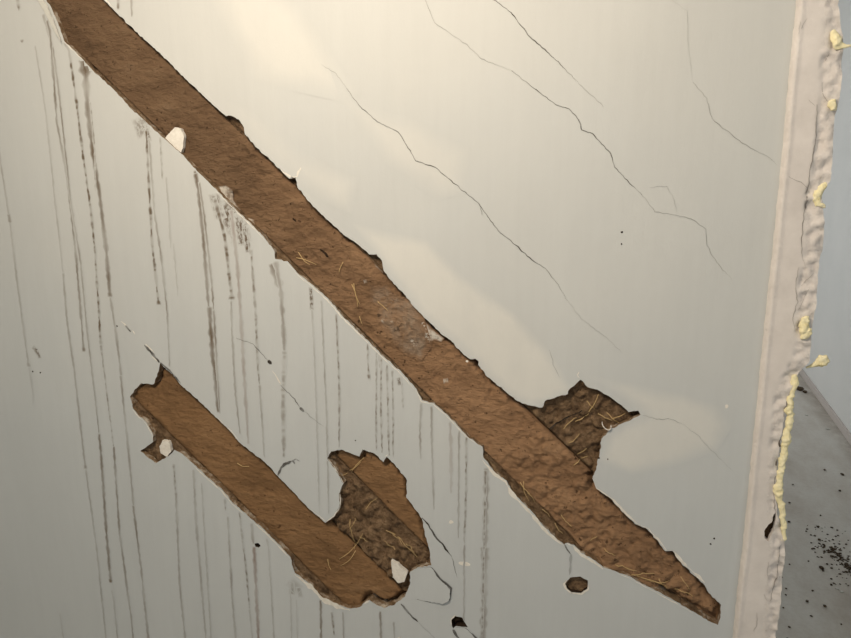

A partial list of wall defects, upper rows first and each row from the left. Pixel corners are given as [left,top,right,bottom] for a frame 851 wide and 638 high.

water stain [34,13,150,638]
water stain [130,116,178,367]
water stain [193,170,265,458]
water stain [268,261,287,457]
flaking render [38,0,720,618]
crack [324,66,618,349]
crack [425,0,731,278]
crack [790,90,827,330]
crack [401,604,459,638]
crack [422,518,457,575]
flaking render [450,615,477,638]
water stain [478,467,490,638]